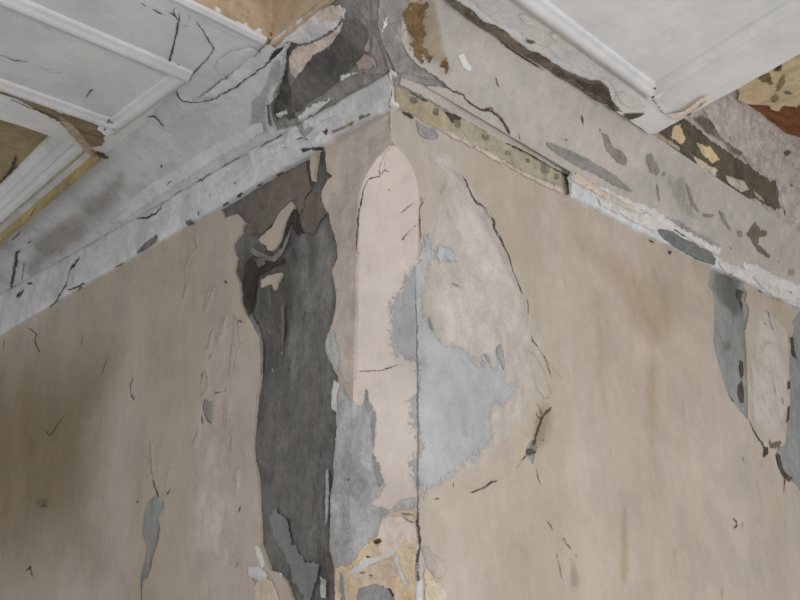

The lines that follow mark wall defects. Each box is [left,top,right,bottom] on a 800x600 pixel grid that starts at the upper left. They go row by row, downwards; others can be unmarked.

crack [141,3,215,76]
rust [403,0,449,74]
crack [50,257,85,307]
crack [356,154,388,255]
crack [464,177,529,319]
peeling [340,0,800,490]
spalling [223,123,518,600]
crack [415,282,498,600]
crack [517,405,552,483]